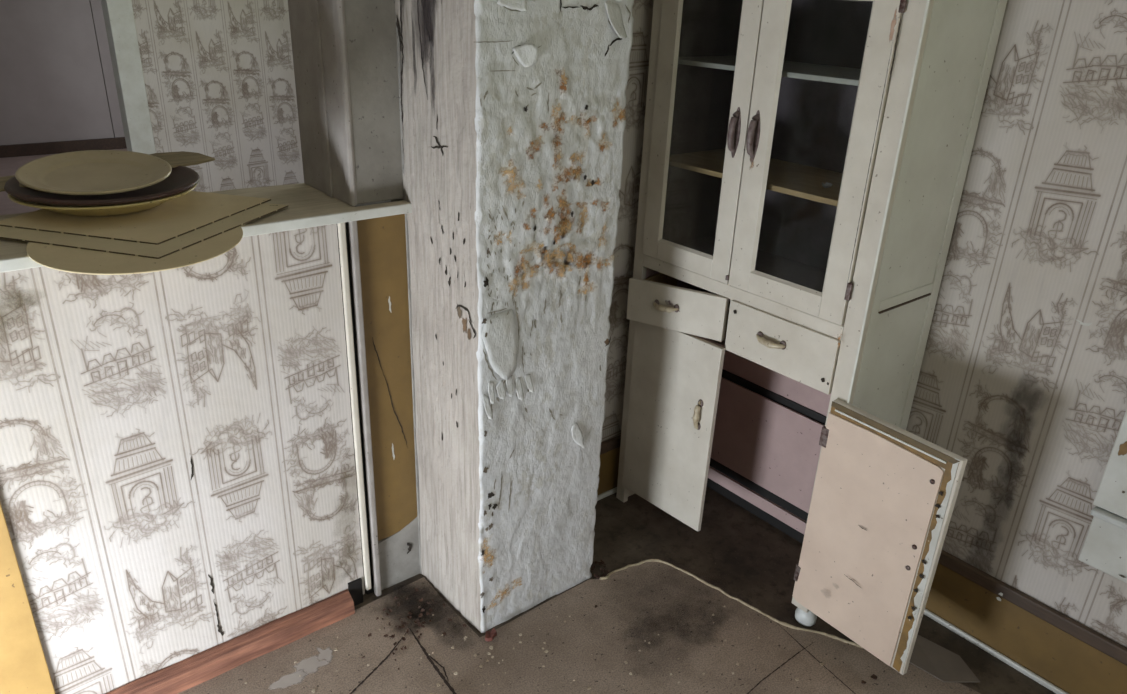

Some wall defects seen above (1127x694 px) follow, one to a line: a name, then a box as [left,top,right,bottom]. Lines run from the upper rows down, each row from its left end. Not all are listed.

leakage [412,0,434,101]
crack [560,0,598,11]
rust [509,108,610,295]